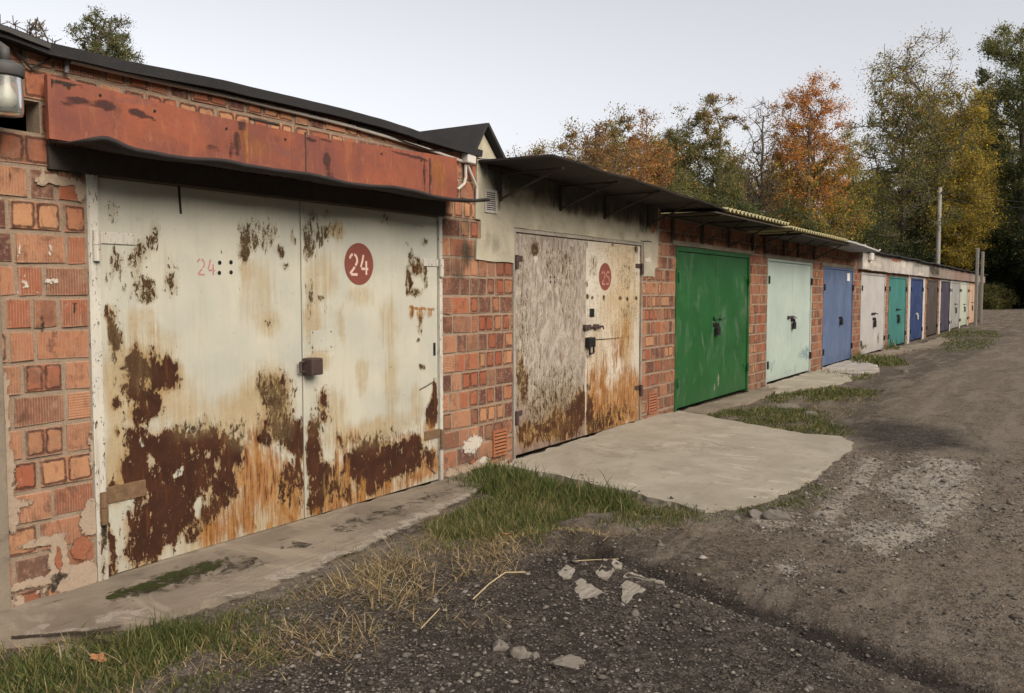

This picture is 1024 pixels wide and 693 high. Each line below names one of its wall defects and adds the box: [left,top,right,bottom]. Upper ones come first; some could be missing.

rust [229,120,248,160]
rust [306,137,333,178]
rust [409,306,434,341]
rust [516,327,642,453]
rust [103,342,438,576]
spalling [11,498,107,608]